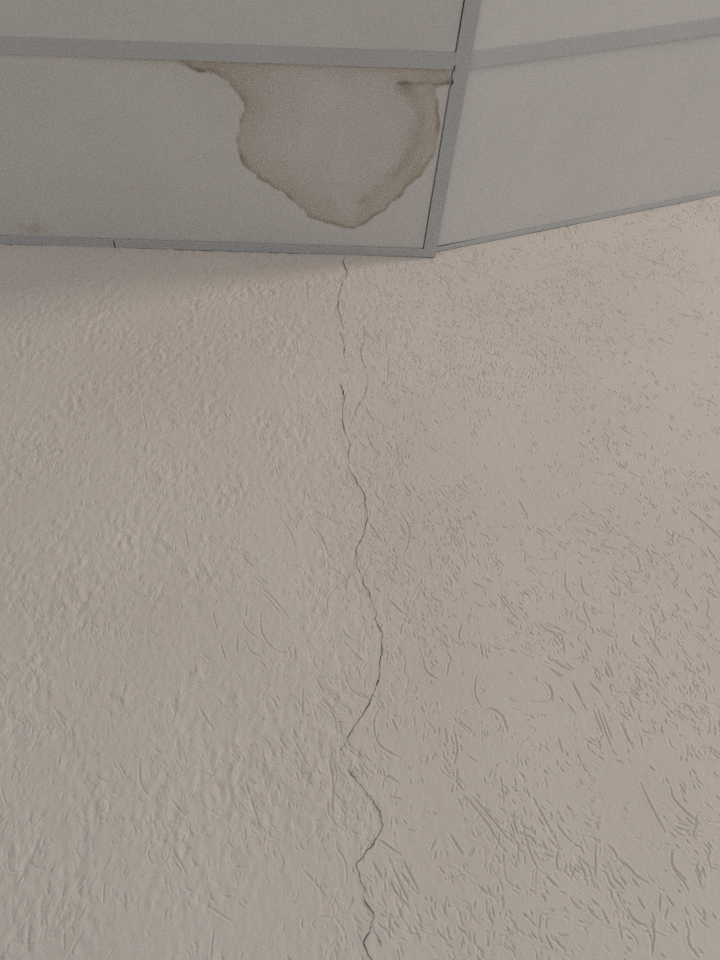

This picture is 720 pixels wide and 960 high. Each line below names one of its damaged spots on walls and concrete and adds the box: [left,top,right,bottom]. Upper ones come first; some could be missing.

crack [341,385,383,748]
crack [349,771,383,958]